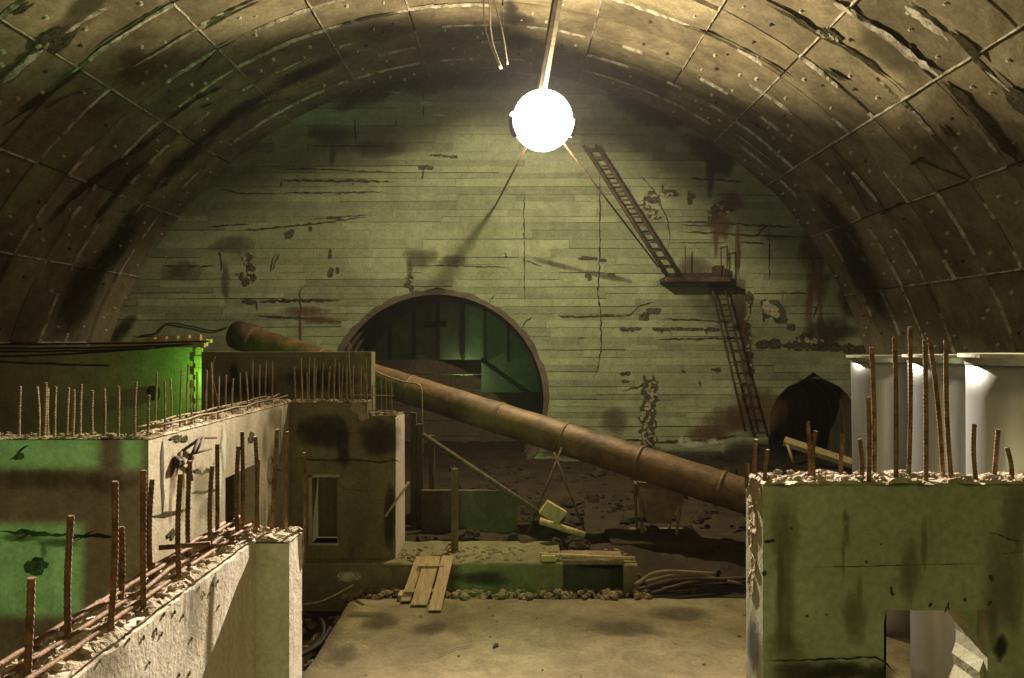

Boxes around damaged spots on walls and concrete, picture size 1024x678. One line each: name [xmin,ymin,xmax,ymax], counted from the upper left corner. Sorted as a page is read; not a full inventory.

water stain [64,0,101,32]
crack [211,118,397,270]
spalling [638,184,696,220]
spalling [235,252,257,286]
crack [557,162,735,381]
spalling [735,291,877,482]
water stain [298,417,349,467]
water stain [364,424,397,454]
spalling [638,383,659,447]
crack [0,529,112,542]
spalling [744,439,775,598]
crack [833,561,980,569]